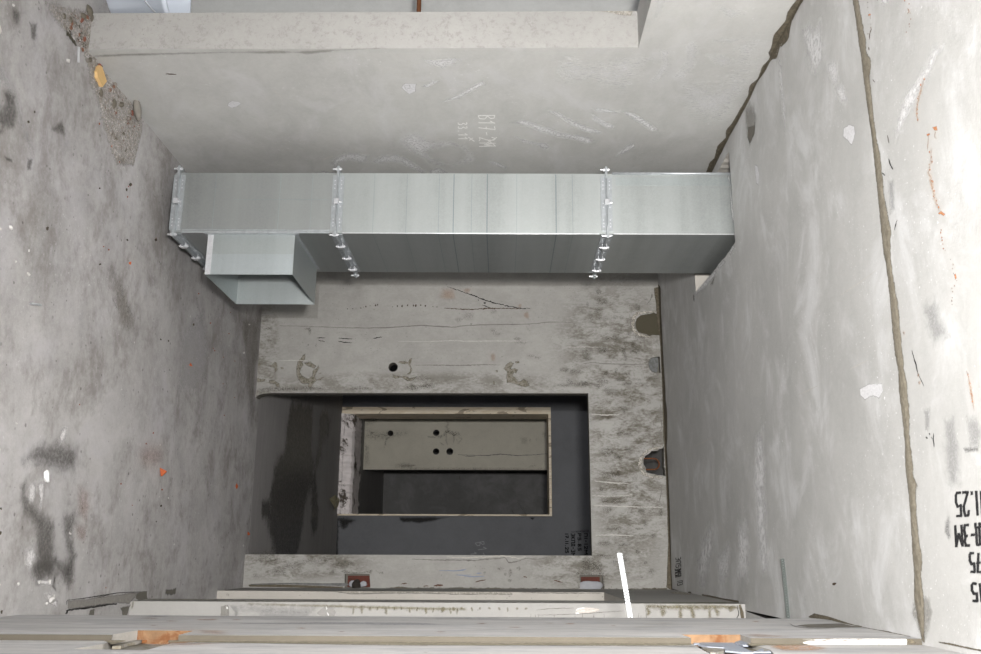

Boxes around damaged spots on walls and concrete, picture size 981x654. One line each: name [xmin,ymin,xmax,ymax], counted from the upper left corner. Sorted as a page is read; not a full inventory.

spalling [49,4,142,166]
damp [34,428,73,464]
damp [23,484,74,607]